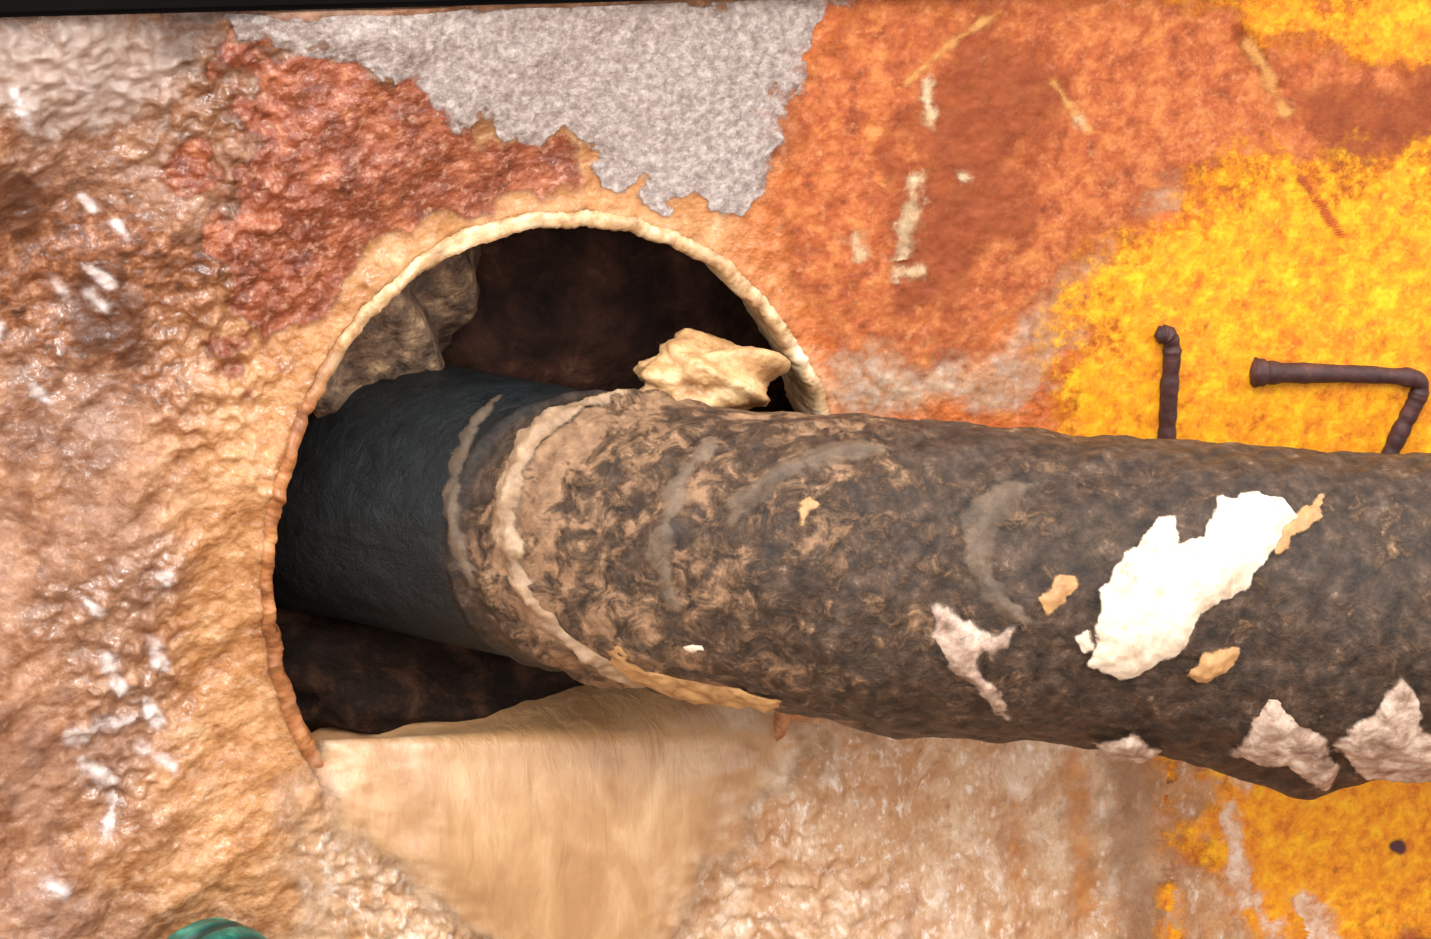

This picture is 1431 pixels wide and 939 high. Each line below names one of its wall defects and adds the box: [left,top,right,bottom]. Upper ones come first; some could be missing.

spalling [224,0,852,216]
water stain [78,193,95,212]
corrosion [159,11,585,377]
corrosion [770,0,1431,373]
water stain [84,266,116,310]
water stain [156,572,172,586]
water stain [86,601,106,616]
water stain [103,652,129,697]
water stain [150,640,169,670]
water stain [63,699,163,743]
water stain [78,758,118,837]
corrosion [1389,840,1406,854]